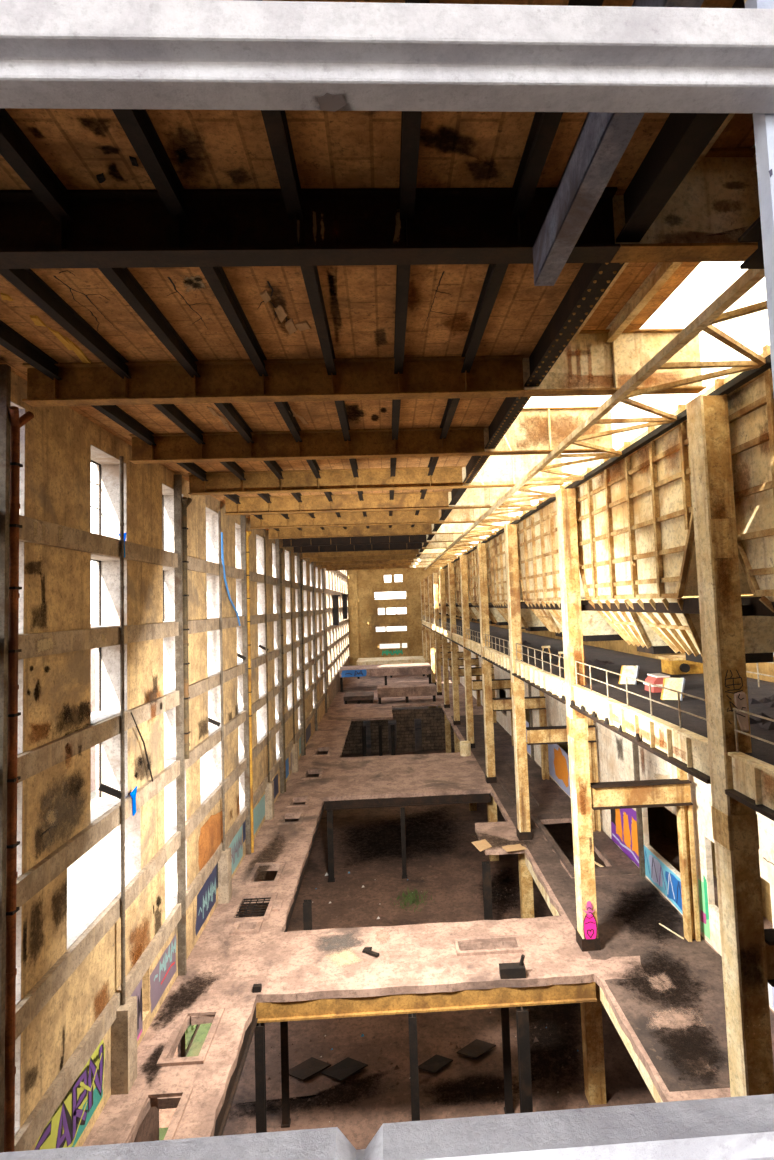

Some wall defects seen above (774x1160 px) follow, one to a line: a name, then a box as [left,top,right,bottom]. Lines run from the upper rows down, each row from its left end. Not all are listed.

peeling [317,93,349,112]
leakage [420,126,500,180]
crack [54,270,118,331]
spalling [257,281,311,335]
leakage [26,561,53,652]
leakage [27,666,50,701]
leakage [35,774,84,857]